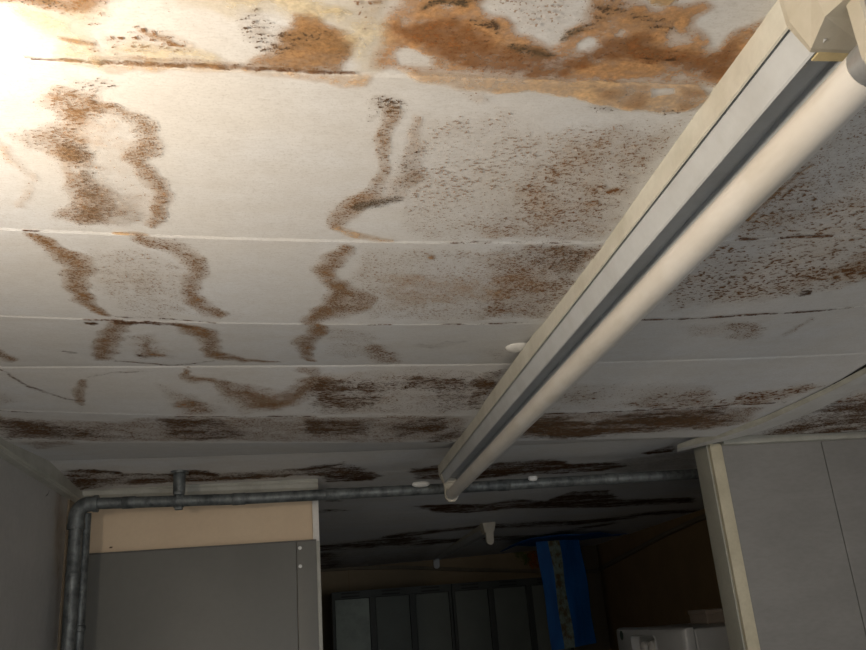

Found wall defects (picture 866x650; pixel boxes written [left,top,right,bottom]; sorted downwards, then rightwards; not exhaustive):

damp [0,0,760,449]
damp [642,107,866,339]
crack [12,377,87,406]
damp [524,383,822,440]
damp [763,394,866,435]
damp [64,469,173,490]
damp [186,464,385,482]
damp [410,465,441,480]
damp [475,459,631,480]